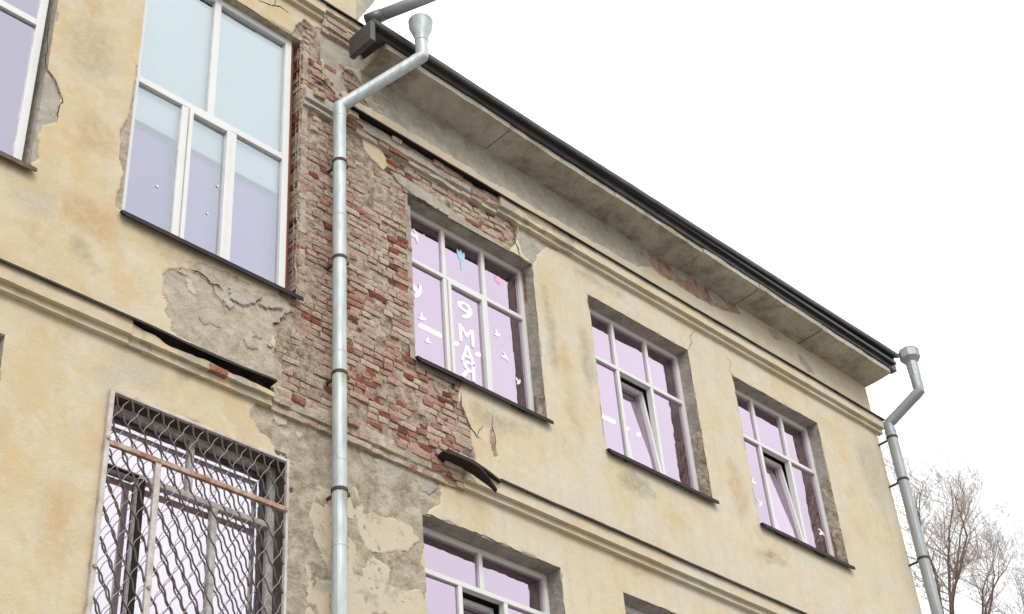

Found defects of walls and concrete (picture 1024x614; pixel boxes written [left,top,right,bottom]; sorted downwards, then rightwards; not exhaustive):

crack [174,270,225,310]
flaking render [124,20,740,614]
crack [460,392,496,448]